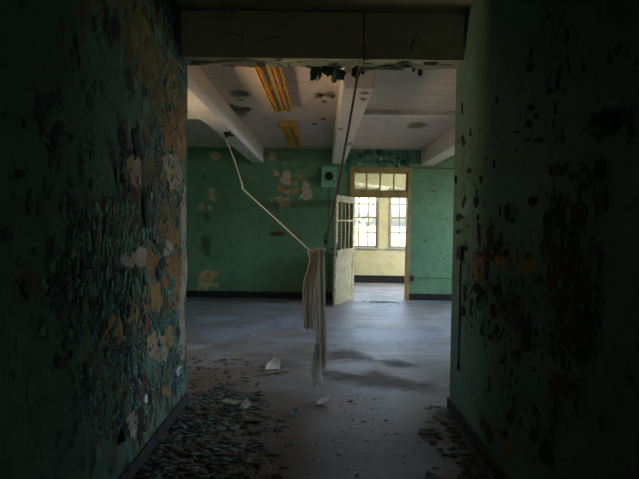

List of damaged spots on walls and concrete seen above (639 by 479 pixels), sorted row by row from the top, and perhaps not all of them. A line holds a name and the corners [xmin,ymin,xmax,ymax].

water stain [230,90,251,115]
peeling [97,0,462,446]
peeling [454,126,520,258]
peeling [460,277,548,353]